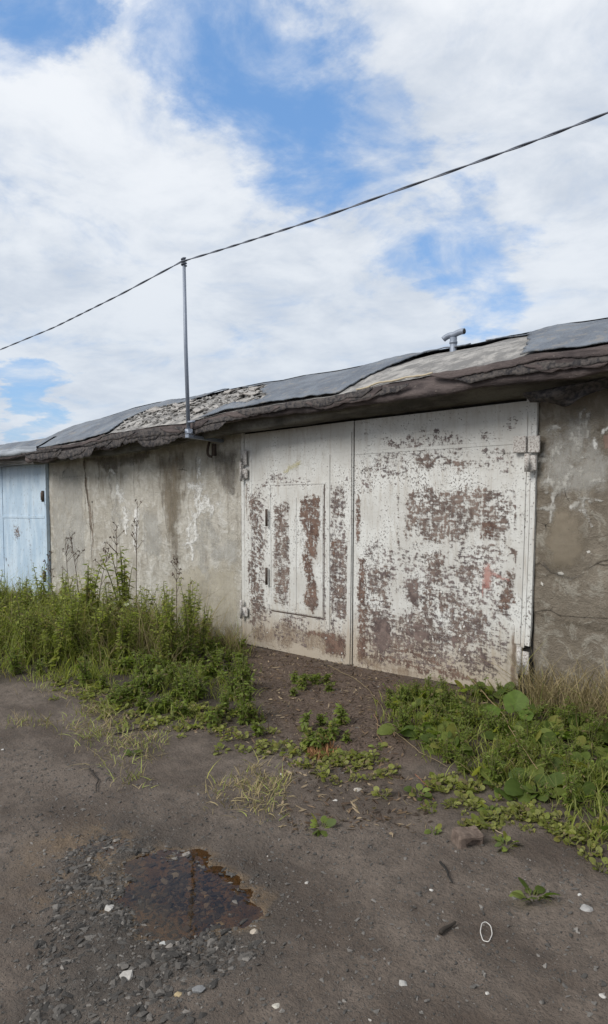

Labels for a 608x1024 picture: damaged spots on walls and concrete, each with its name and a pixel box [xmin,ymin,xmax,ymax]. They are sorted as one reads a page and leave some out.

spalling [116,385,267,430]
water stain [160,455,221,560]
peeling [247,416,518,684]
water stain [537,409,605,522]